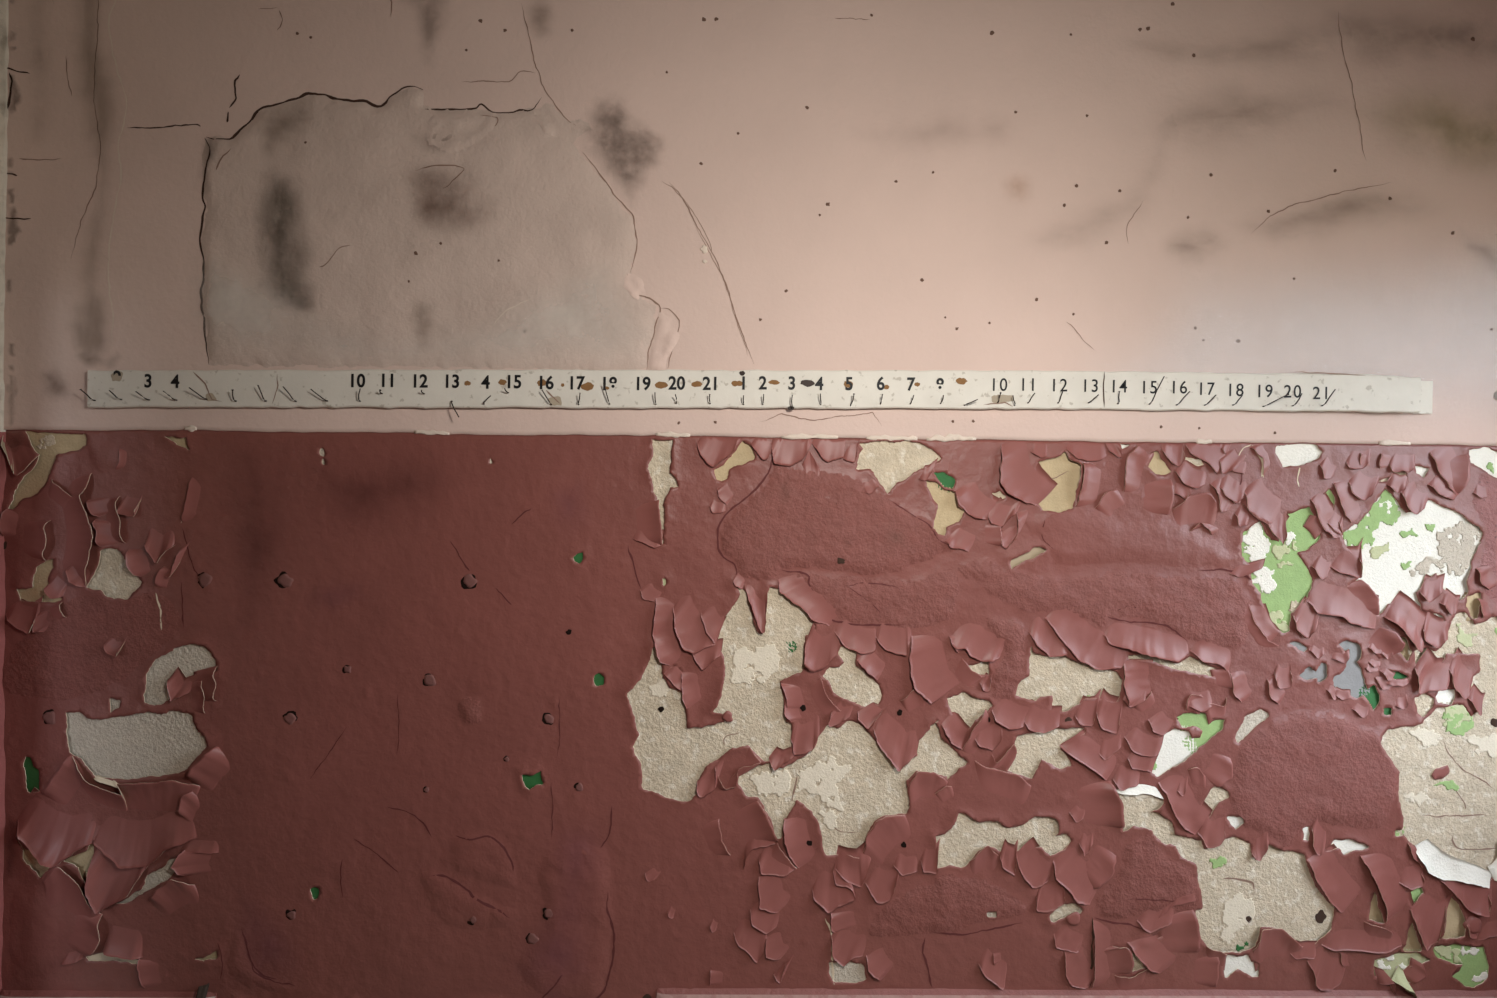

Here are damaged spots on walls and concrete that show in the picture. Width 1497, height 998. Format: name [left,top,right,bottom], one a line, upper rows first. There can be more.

crack [7,67,30,109]
crack [7,158,62,176]
crack [66,0,680,402]
crack [663,182,754,363]
peeling [0,430,201,634]
peeling [627,421,1497,998]
peeling [17,644,230,988]